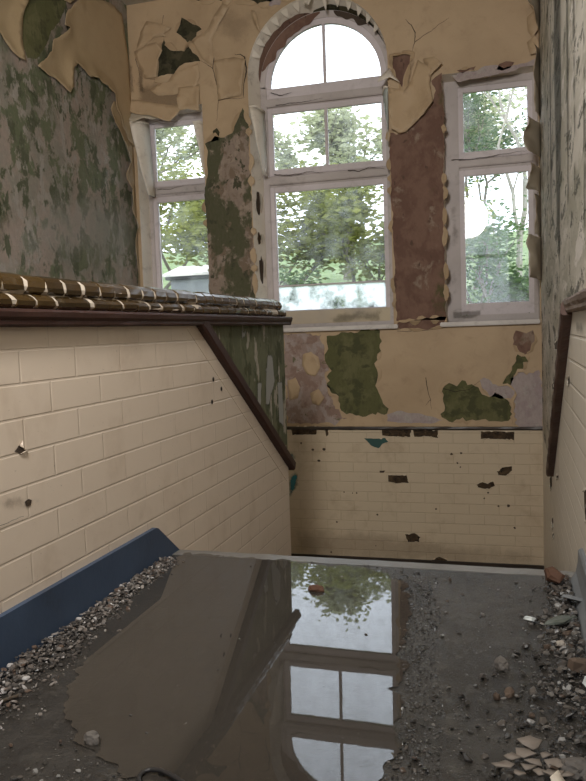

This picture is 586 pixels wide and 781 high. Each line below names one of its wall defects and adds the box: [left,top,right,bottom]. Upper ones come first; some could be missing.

peeling [197,0,384,81]
peeling [0,0,268,298]
peeling [378,50,449,332]
peeling [452,0,542,281]
peeling [212,325,554,448]
spalling [380,471,410,484]
spalling [477,465,512,499]